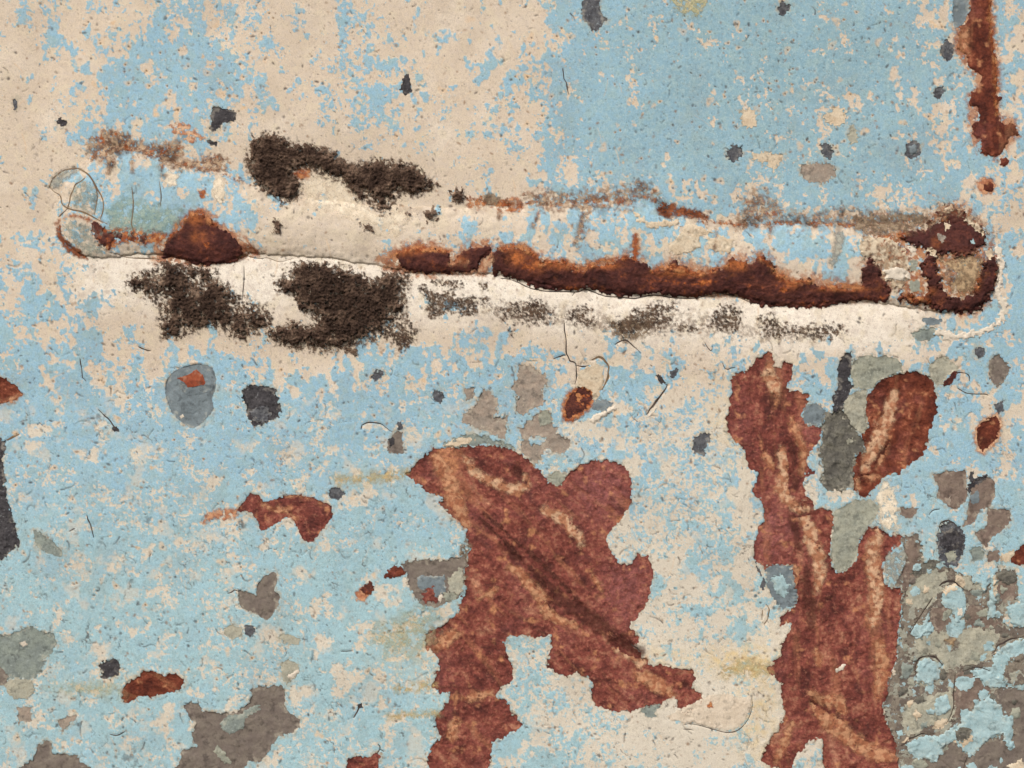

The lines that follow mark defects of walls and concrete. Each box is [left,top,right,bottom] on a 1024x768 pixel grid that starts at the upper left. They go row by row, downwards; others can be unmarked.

rust [954,0,1021,167]
water stain [293,170,410,237]
crack [501,278,754,304]
rust [375,180,999,317]
peeling [0,438,20,560]
peeling [241,385,282,426]
rust [339,444,702,768]
rust [724,351,903,768]
spalling [802,352,903,573]
rust [853,371,958,498]
peeling [882,470,1024,768]
peeling [175,659,300,768]